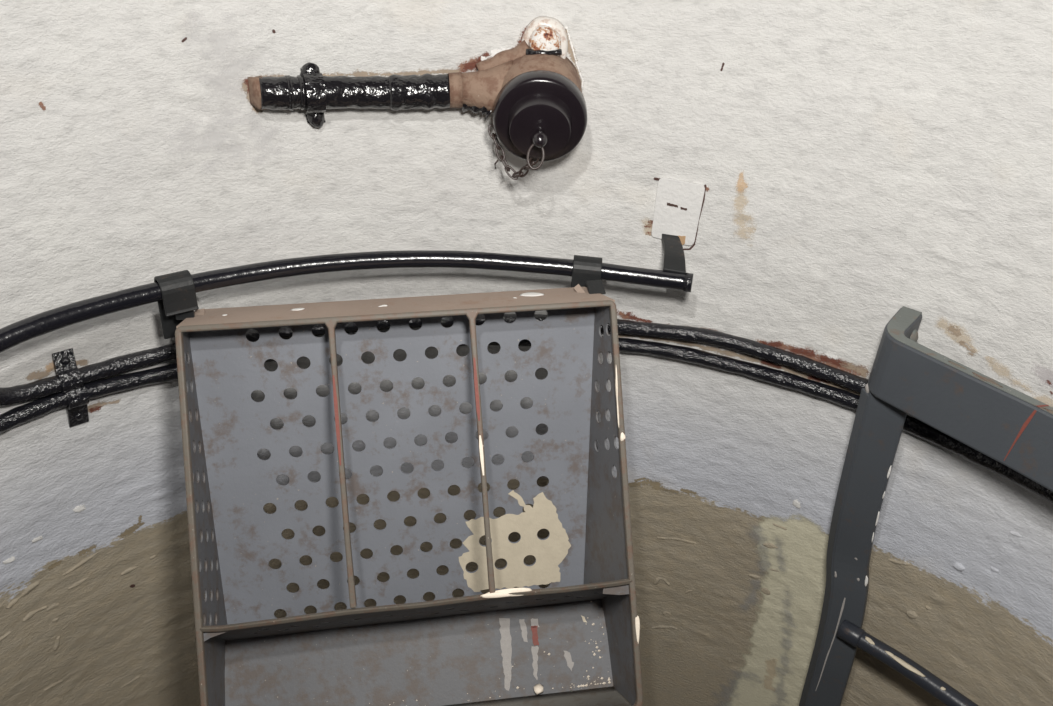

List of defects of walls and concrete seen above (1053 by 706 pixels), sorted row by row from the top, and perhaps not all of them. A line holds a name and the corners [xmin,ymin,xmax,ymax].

rust [757,339,868,377]